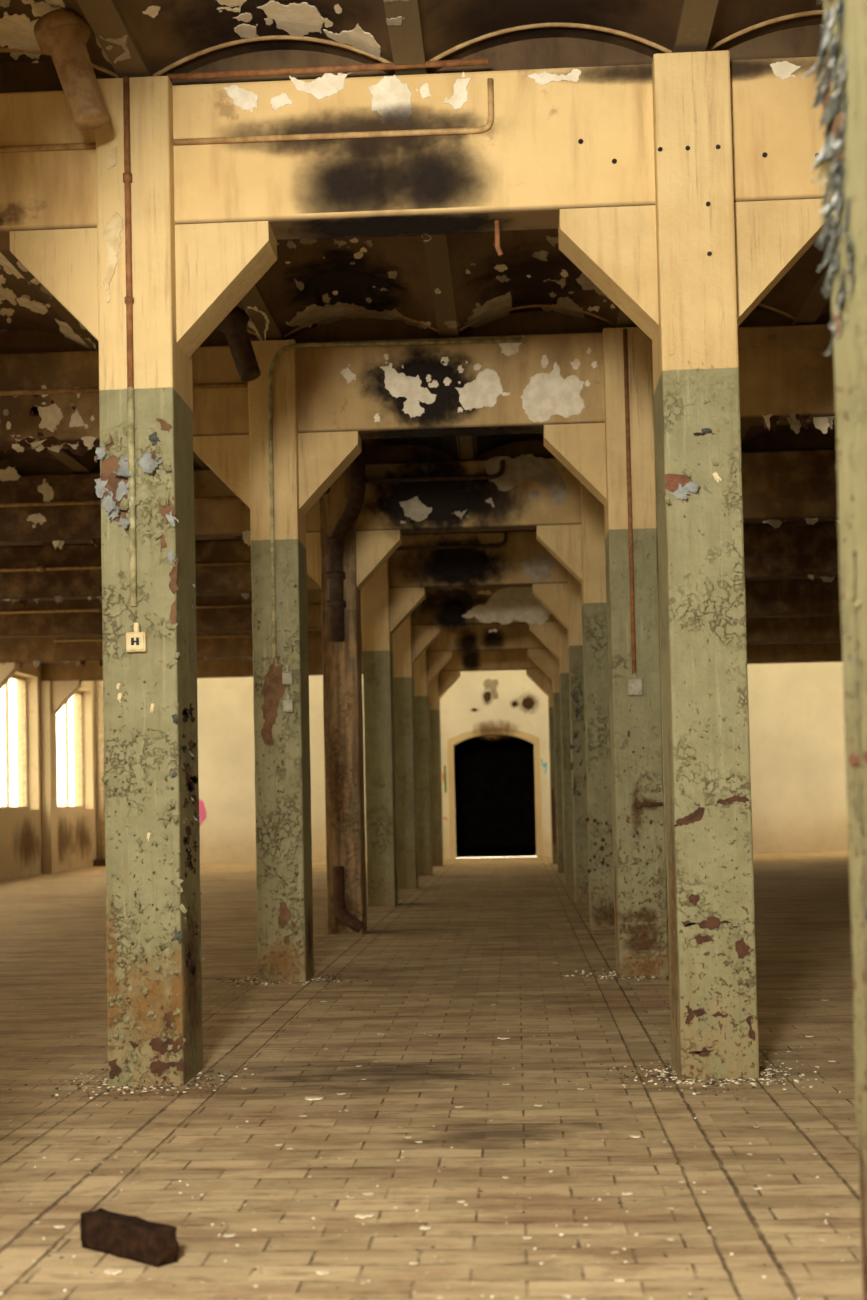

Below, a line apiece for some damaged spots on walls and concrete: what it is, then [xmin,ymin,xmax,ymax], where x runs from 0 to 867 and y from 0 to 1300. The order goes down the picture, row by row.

peeling [0,0,65,63]
peeling [217,0,381,58]
peeling [222,72,350,112]
peeling [368,71,472,115]
peeling [528,69,582,85]
peeling [770,0,853,356]
peeling [286,264,513,329]
peeling [380,348,597,423]
spalling [761,386,856,468]
peeling [674,773,750,844]
peeling [102,699,205,1085]
peeling [680,884,752,974]